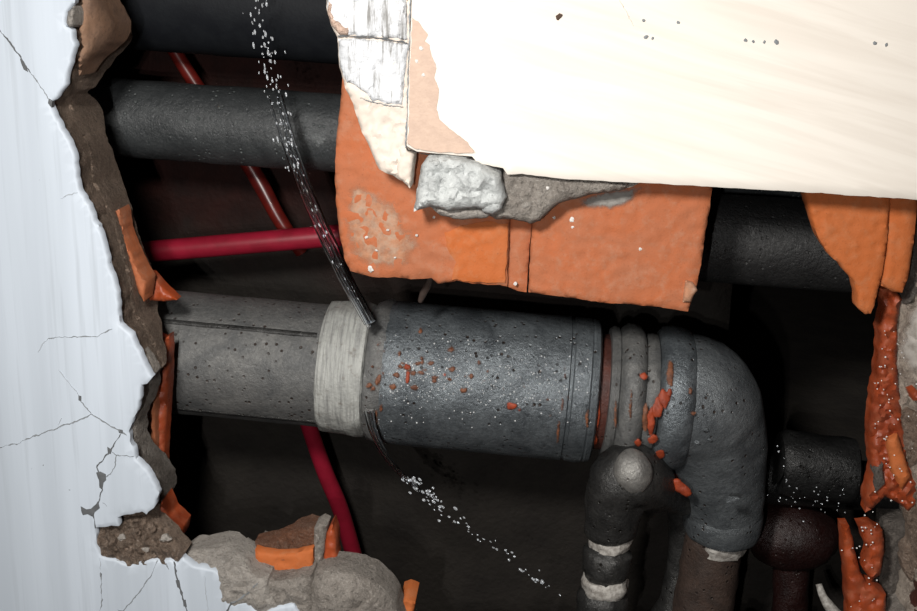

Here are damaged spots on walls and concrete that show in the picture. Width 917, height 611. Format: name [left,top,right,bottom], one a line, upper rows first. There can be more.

crack [0,31,55,107]
peeling [326,0,474,188]
crack [0,372,134,528]
crack [38,329,111,352]
spalling [55,0,277,611]
peeling [682,280,697,302]
spalling [837,214,917,611]
crack [100,560,258,611]